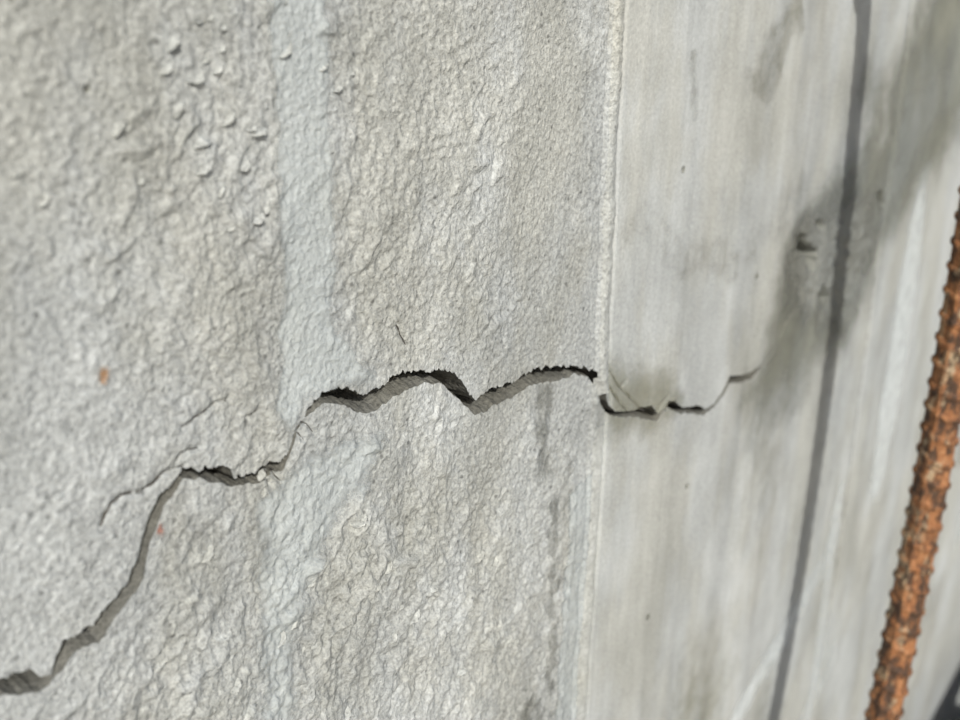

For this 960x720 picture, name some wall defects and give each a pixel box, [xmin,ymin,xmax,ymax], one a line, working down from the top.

damp [755,0,960,495]
crack [0,342,777,696]